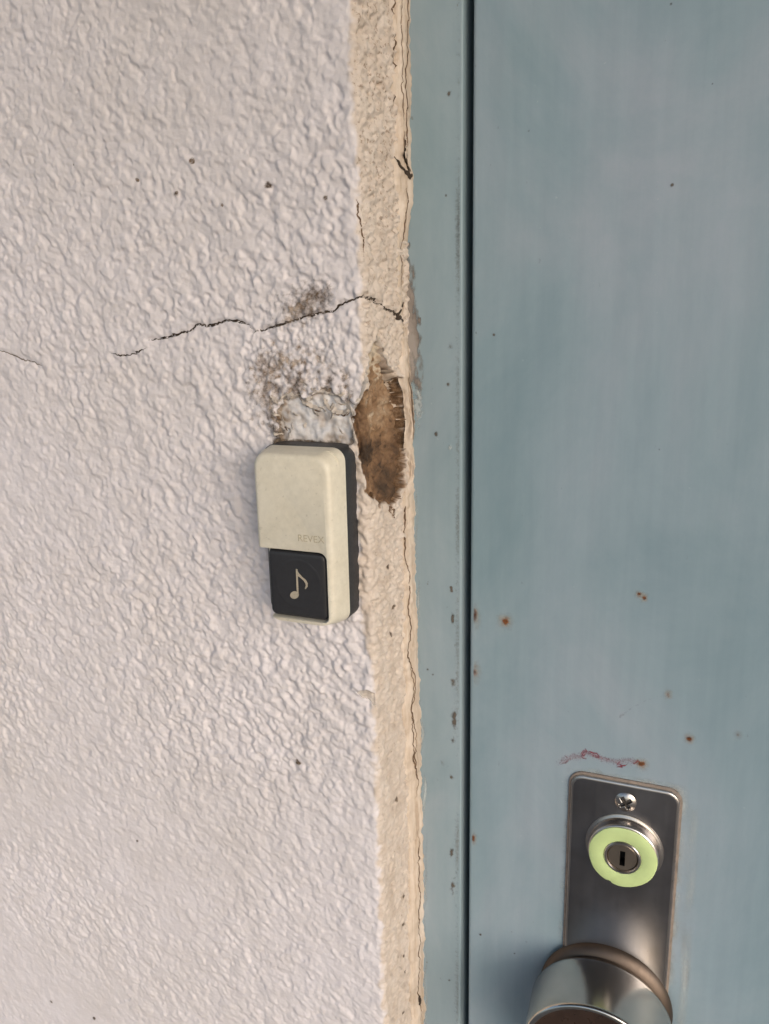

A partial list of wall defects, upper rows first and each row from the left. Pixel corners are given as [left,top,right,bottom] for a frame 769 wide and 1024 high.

crack [111,294,404,357]
spalling [270,335,401,518]